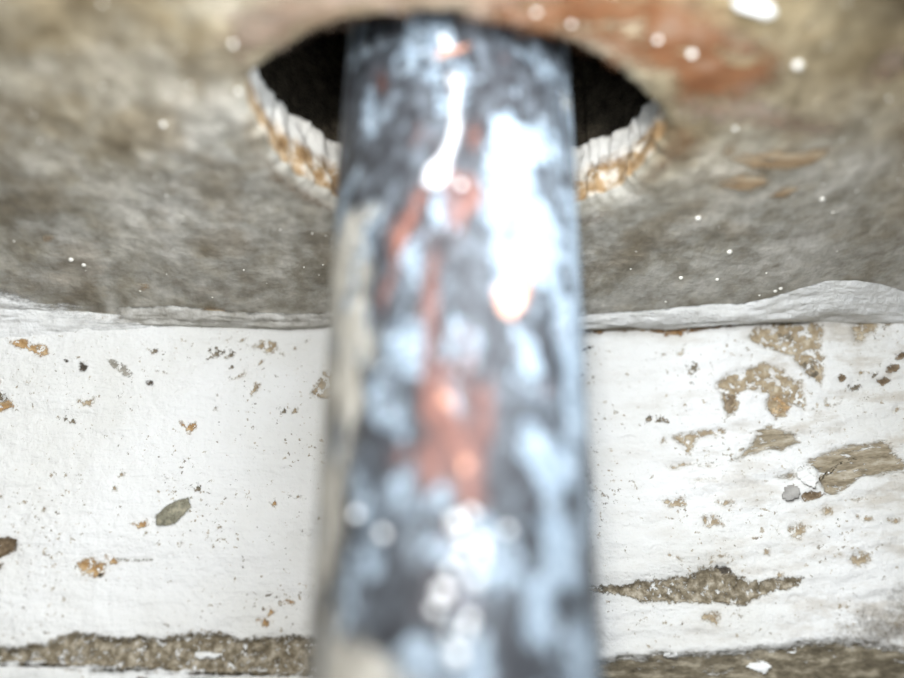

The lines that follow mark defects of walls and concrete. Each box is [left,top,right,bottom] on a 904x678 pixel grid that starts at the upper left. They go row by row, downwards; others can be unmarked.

rust [228,0,834,135]
rust [722,148,828,190]
spalling [718,322,825,457]
spalling [662,428,724,452]
spalling [778,441,904,502]
spalling [0,536,17,568]
peeling [851,551,871,566]
spalling [596,555,805,625]
peeling [195,651,223,659]
peeling [746,661,772,674]